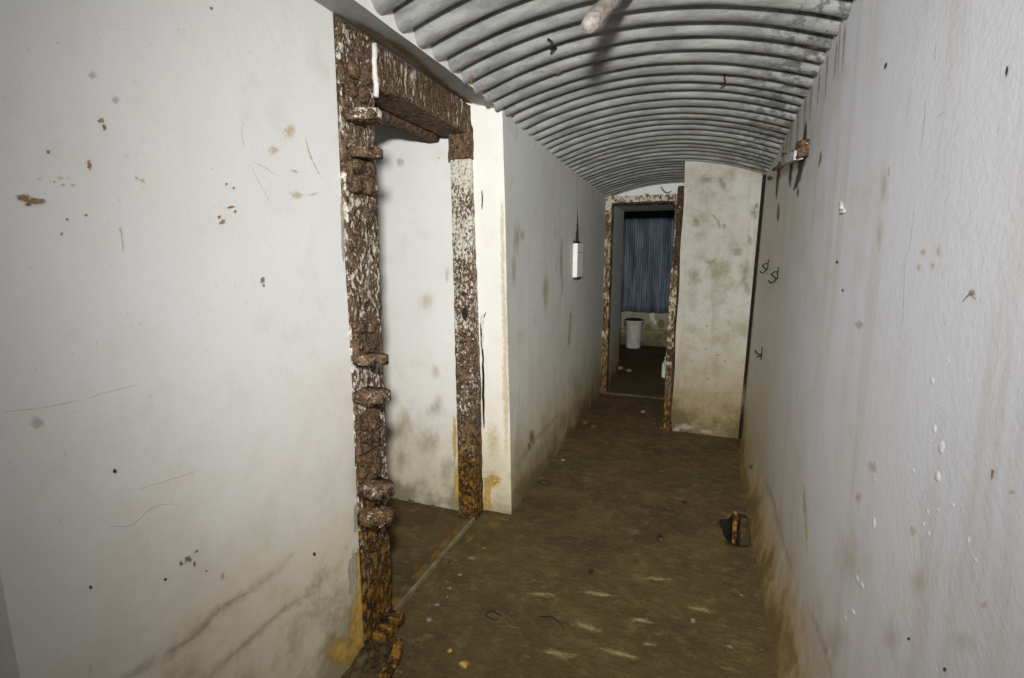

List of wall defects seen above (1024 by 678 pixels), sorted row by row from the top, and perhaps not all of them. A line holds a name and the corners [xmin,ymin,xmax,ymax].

rust [355,23,485,104]
rust [17,194,44,206]
rust [485,476,499,509]
rust [326,549,363,665]